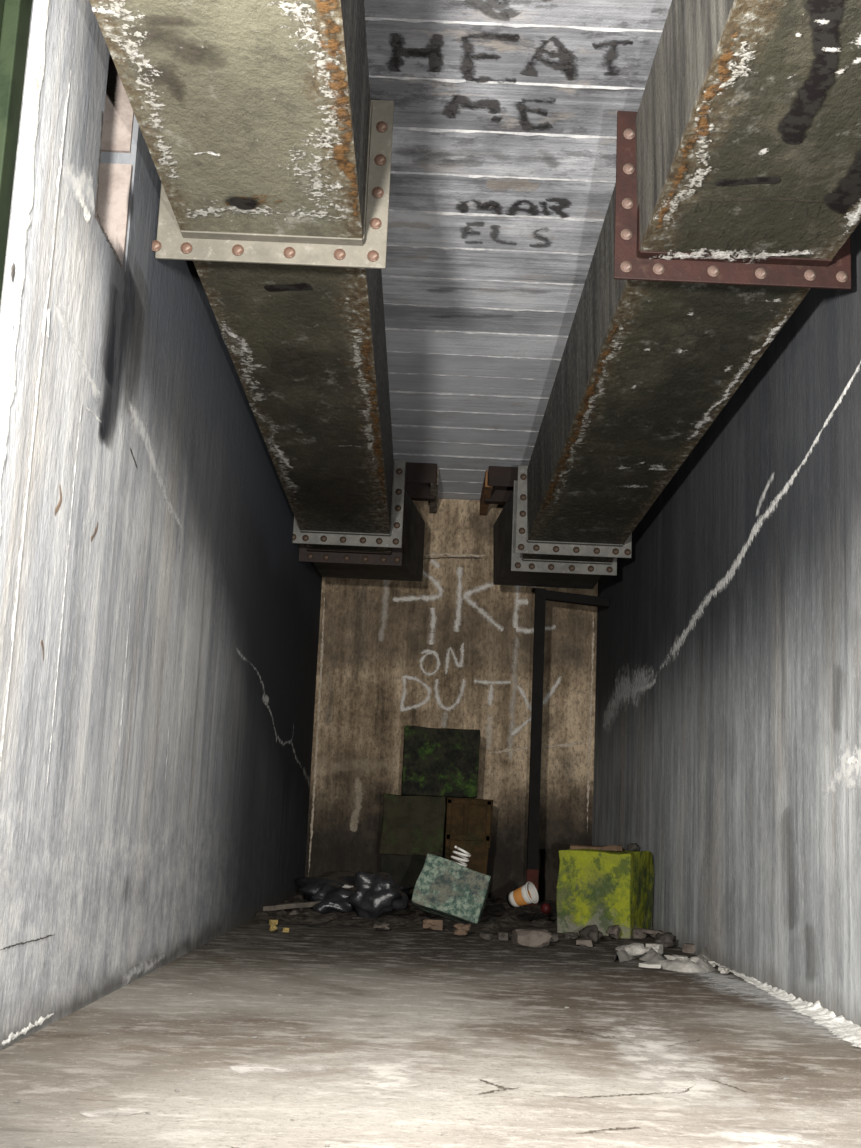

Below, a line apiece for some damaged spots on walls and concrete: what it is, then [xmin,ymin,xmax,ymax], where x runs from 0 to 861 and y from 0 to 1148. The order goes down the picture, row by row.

corrosion [315,0,358,221]
crack [236,648,310,786]
damp [1,1013,54,1046]
damp [699,962,861,1048]